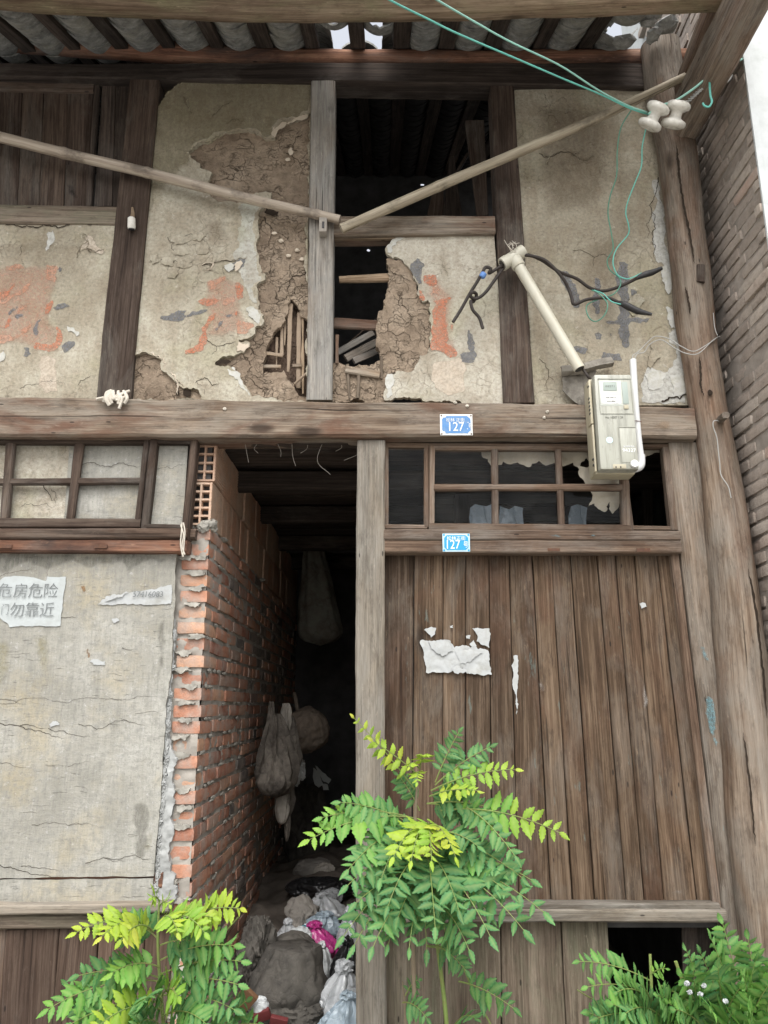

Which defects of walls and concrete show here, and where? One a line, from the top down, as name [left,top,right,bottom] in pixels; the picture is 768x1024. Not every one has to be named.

flaking render [133,354,201,400]
crack [160,233,234,273]
flaking render [190,114,310,402]
flaking render [333,237,431,403]
flaking render [641,180,686,404]
crack [0,696,156,739]
spalling [153,618,177,900]
crack [0,865,58,878]